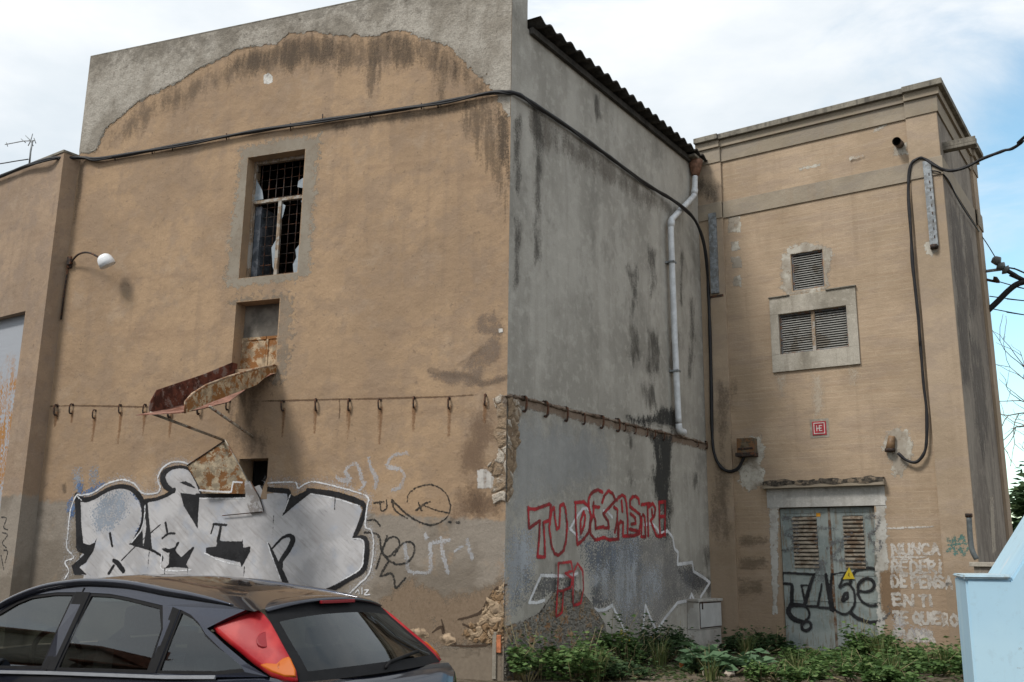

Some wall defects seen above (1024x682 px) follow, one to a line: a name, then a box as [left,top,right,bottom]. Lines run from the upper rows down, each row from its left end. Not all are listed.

damp [533,108,542,207]
damp [631,333,673,372]
corrosion [186,440,268,516]
spalling [487,394,706,504]
damp [626,386,678,541]
spalling [379,579,607,681]